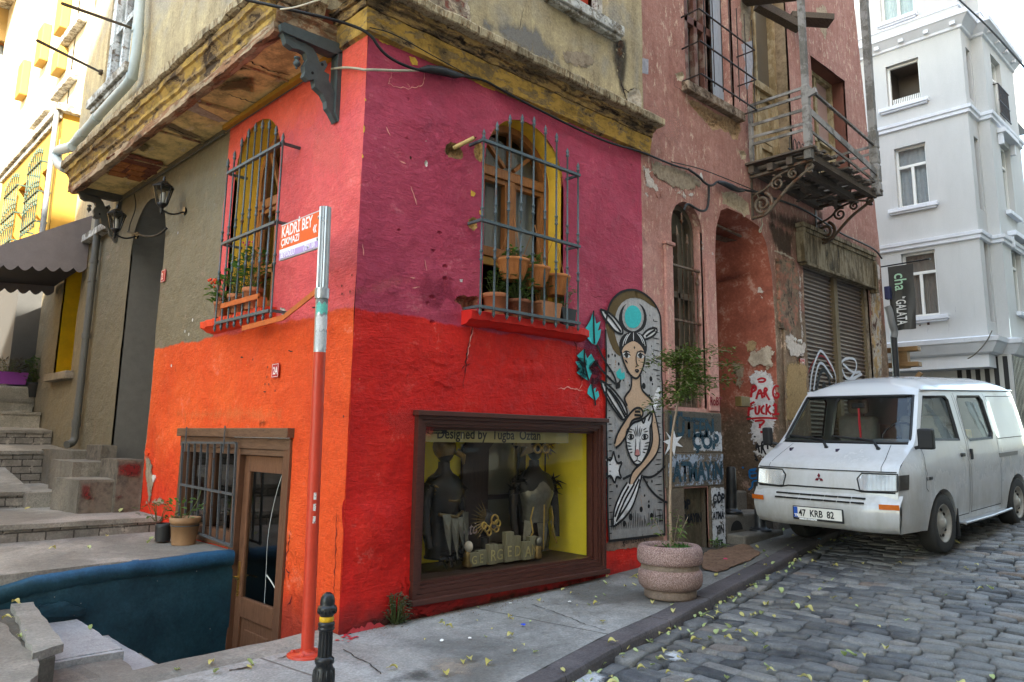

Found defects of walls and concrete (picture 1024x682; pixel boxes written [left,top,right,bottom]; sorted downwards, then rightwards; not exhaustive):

flaking render [643,159,703,199]
crack [462,327,474,382]
flaking render [731,271,806,389]
spalling [144,449,164,505]